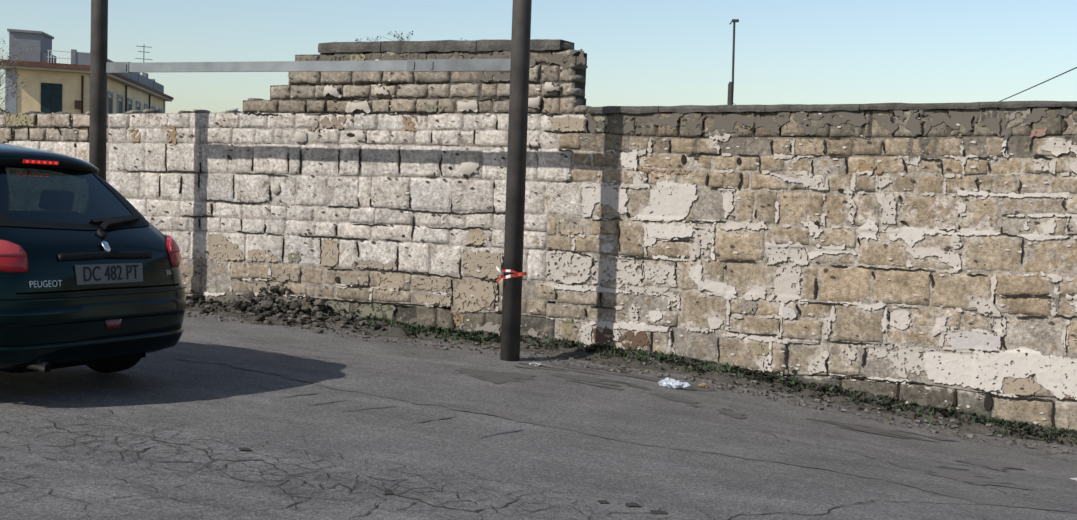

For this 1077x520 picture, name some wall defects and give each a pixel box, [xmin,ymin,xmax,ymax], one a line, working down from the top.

spalling [109,75,399,211]
spalling [1030,127,1047,138]
spalling [1004,377,1074,407]